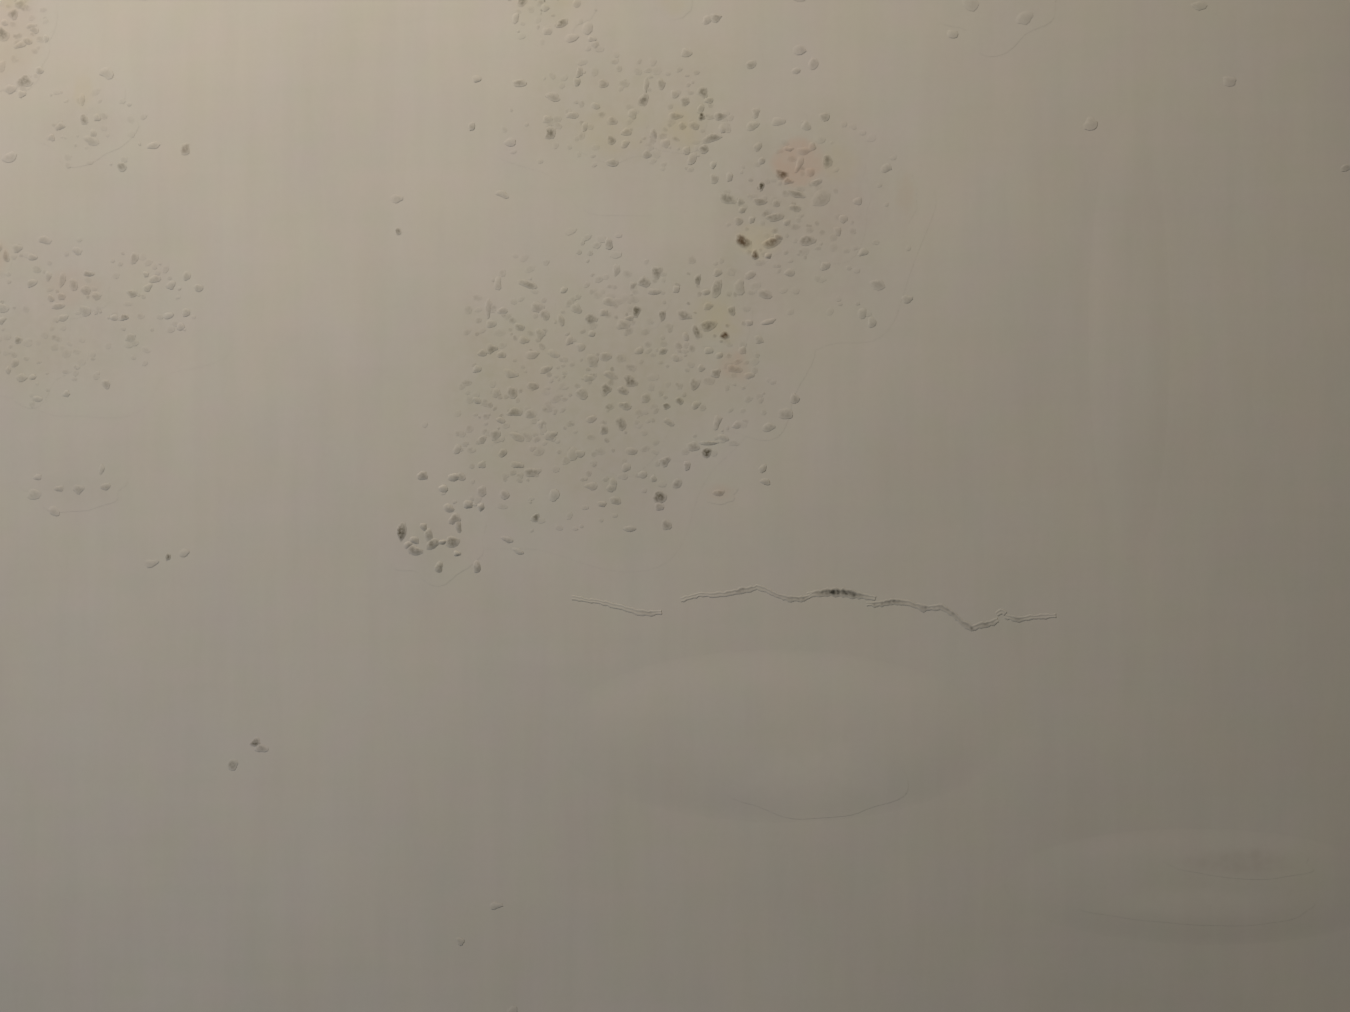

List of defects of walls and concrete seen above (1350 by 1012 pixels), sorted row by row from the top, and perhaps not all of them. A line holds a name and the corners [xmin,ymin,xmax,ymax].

water stain [393,0,936,572]
crack [572,584,1056,631]